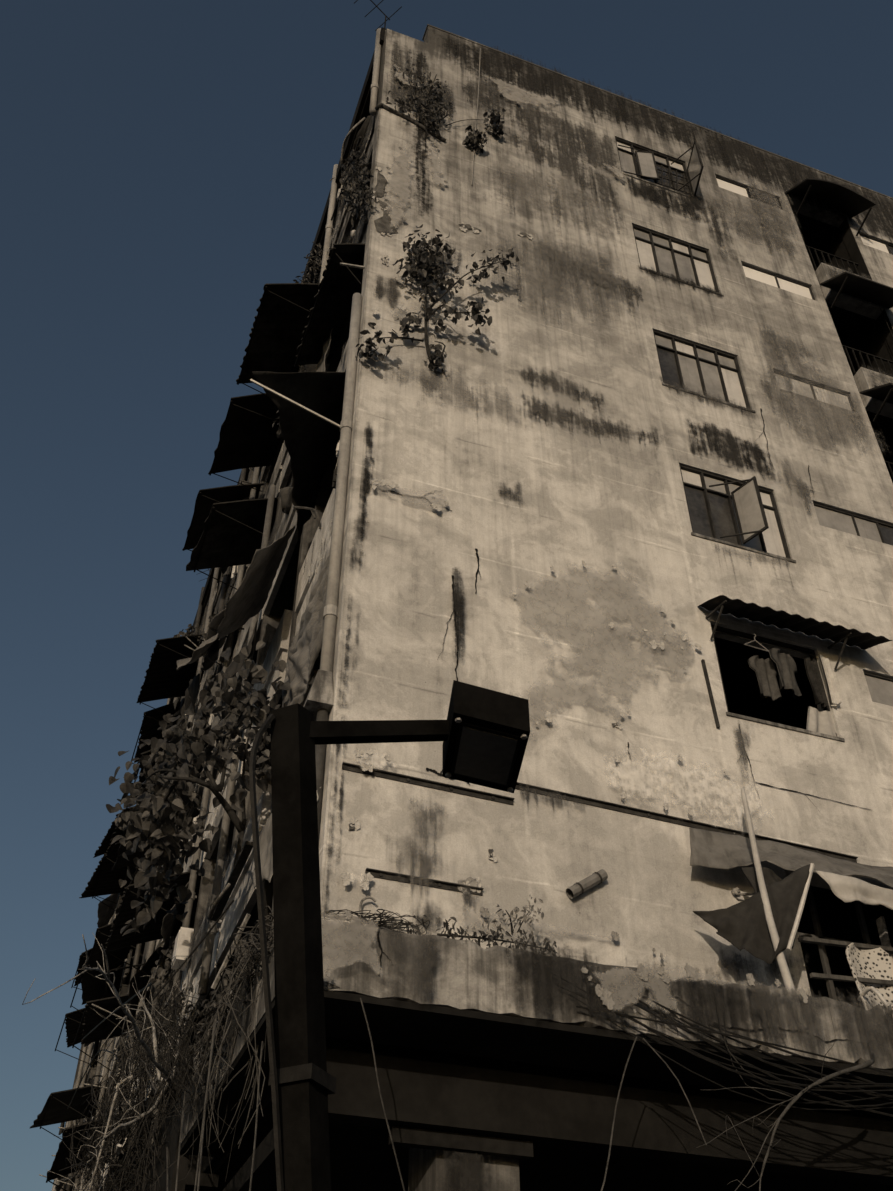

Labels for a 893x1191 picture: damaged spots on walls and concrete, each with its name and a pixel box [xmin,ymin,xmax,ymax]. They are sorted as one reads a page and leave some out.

leakage [385,37,893,262]
leakage [376,276,399,308]
leakage [638,266,722,297]
leakage [476,368,659,444]
leakage [660,377,749,412]
leakage [351,426,374,567]
leakage [499,483,521,500]
leakage [688,420,808,495]
leakage [452,568,465,657]
leakage [506,940,624,1022]
flaking render [581,967,615,1010]
leakage [640,950,825,1049]